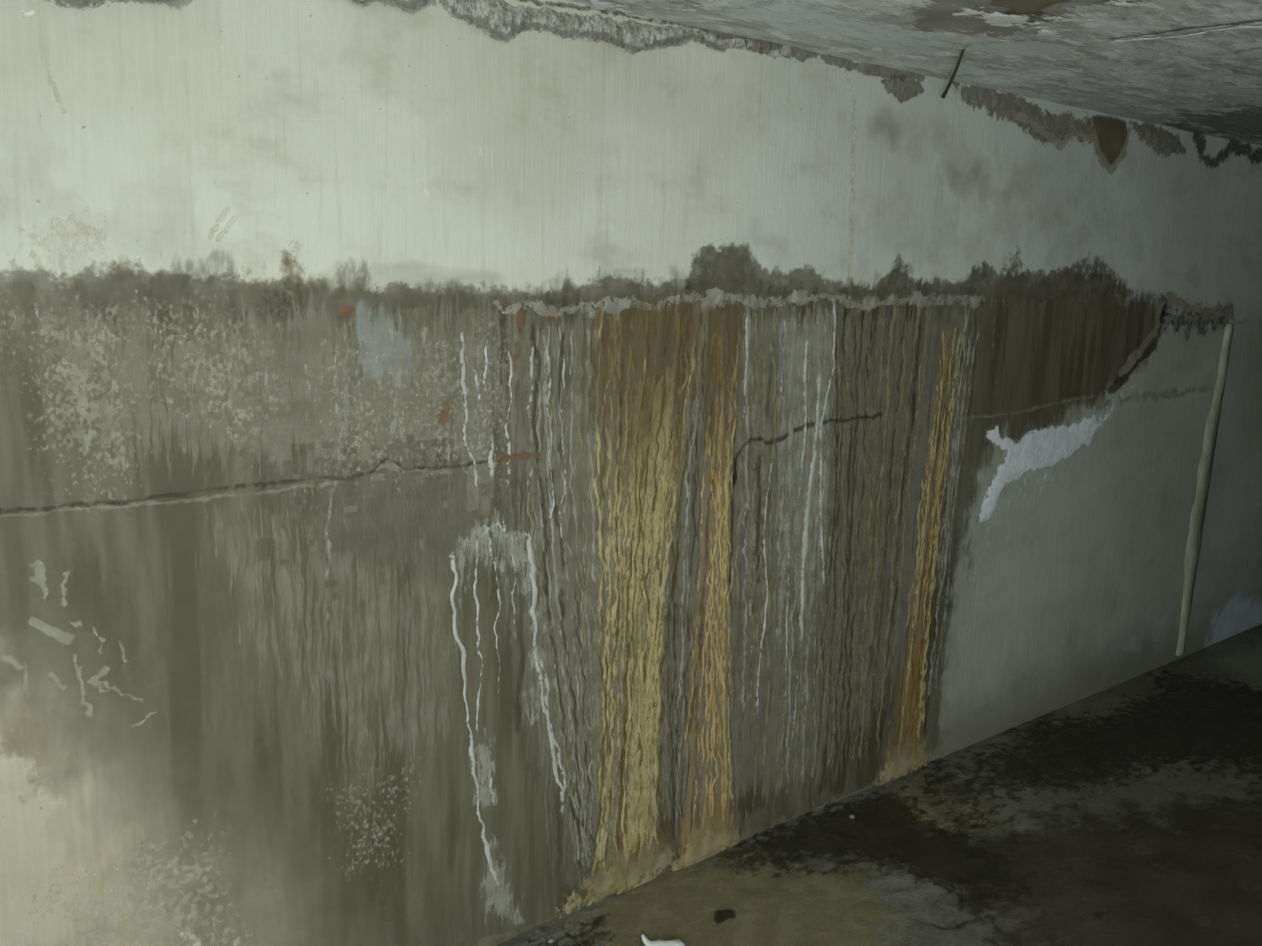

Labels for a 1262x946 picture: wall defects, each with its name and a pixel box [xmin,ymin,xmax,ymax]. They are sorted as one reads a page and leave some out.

spalling [55,0,192,8]
peeling [902,0,1142,39]
spalling [353,0,925,272]
spalling [952,81,1106,167]
spalling [1129,120,1262,168]
crack [0,458,494,514]
water stain [0,216,1262,946]
corrosion [558,291,743,918]
corrosion [872,328,966,788]